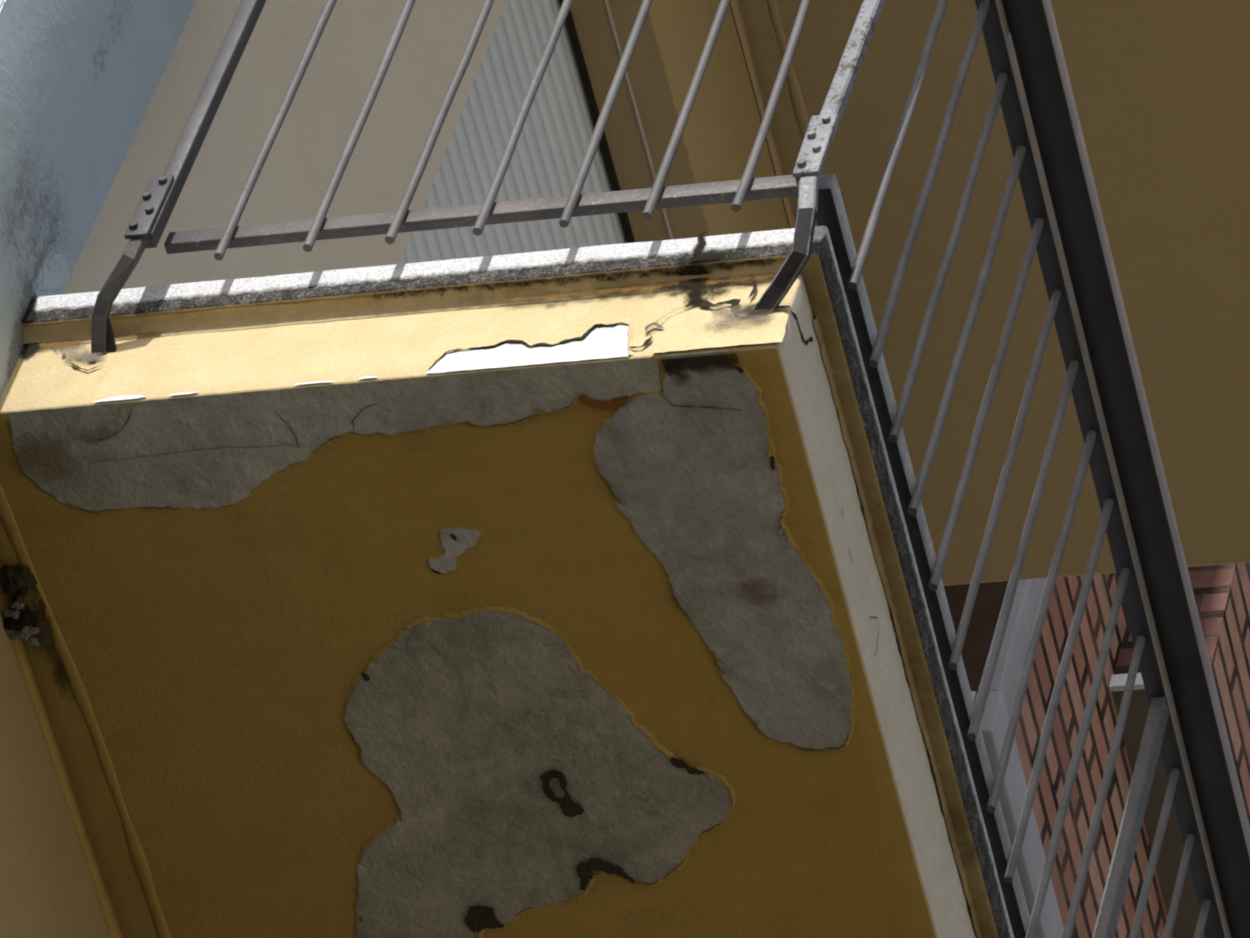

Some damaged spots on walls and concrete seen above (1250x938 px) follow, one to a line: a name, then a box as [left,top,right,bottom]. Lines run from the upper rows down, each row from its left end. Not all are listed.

water stain [7,186,61,376]
water stain [373,232,782,303]
peeling [0,322,856,753]
peeling [341,605,736,938]